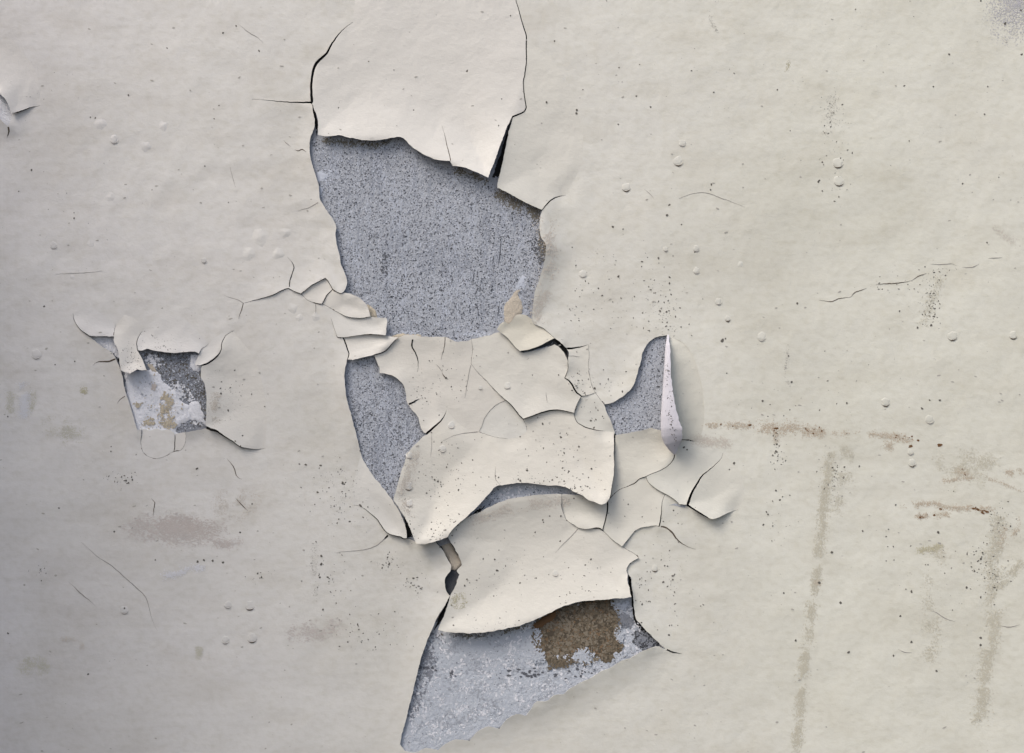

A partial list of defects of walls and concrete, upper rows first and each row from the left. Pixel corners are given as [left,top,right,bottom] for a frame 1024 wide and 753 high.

peeling [73,306,267,458]
peeling [236,0,744,752]
water stain [790,433,860,753]